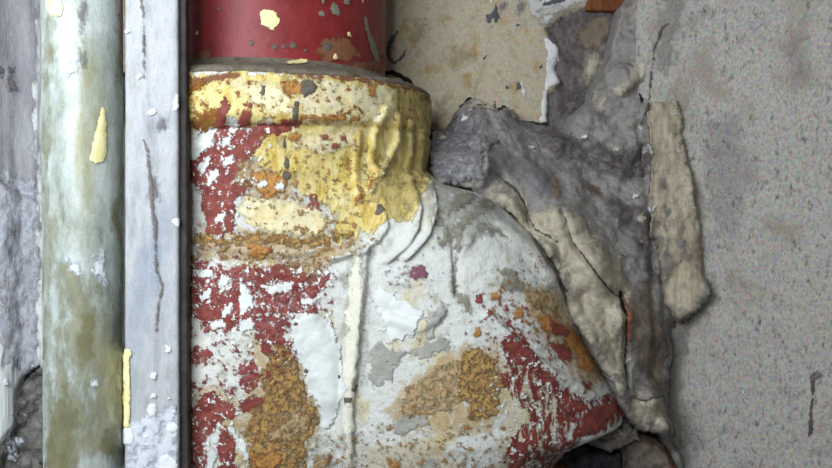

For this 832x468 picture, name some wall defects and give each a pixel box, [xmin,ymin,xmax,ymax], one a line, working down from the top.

peeling [190,79,318,240]
crack [385,70,414,85]
crack [493,101,548,126]
peeling [0,0,43,468]
water stain [44,385,76,468]
water stain [77,316,94,357]
peeling [190,255,358,468]
rust [191,327,569,468]
peeling [374,287,424,344]
rust [488,253,607,388]
peeling [504,314,623,437]
crack [483,140,664,402]